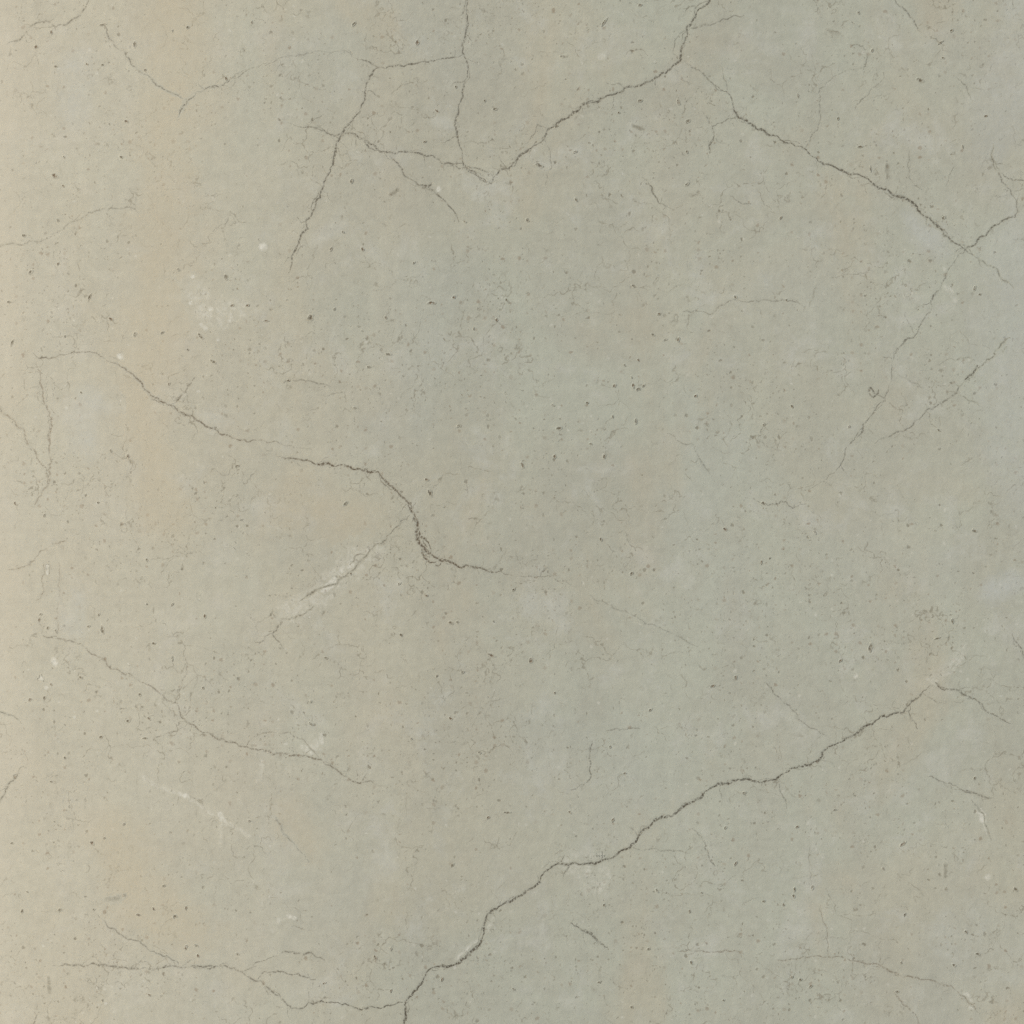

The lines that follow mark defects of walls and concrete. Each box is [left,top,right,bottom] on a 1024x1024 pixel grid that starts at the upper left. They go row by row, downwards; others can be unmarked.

crack [0,0,1024,510]
crack [8,540,390,788]
crack [0,350,698,648]
crack [54,682,1010,1024]